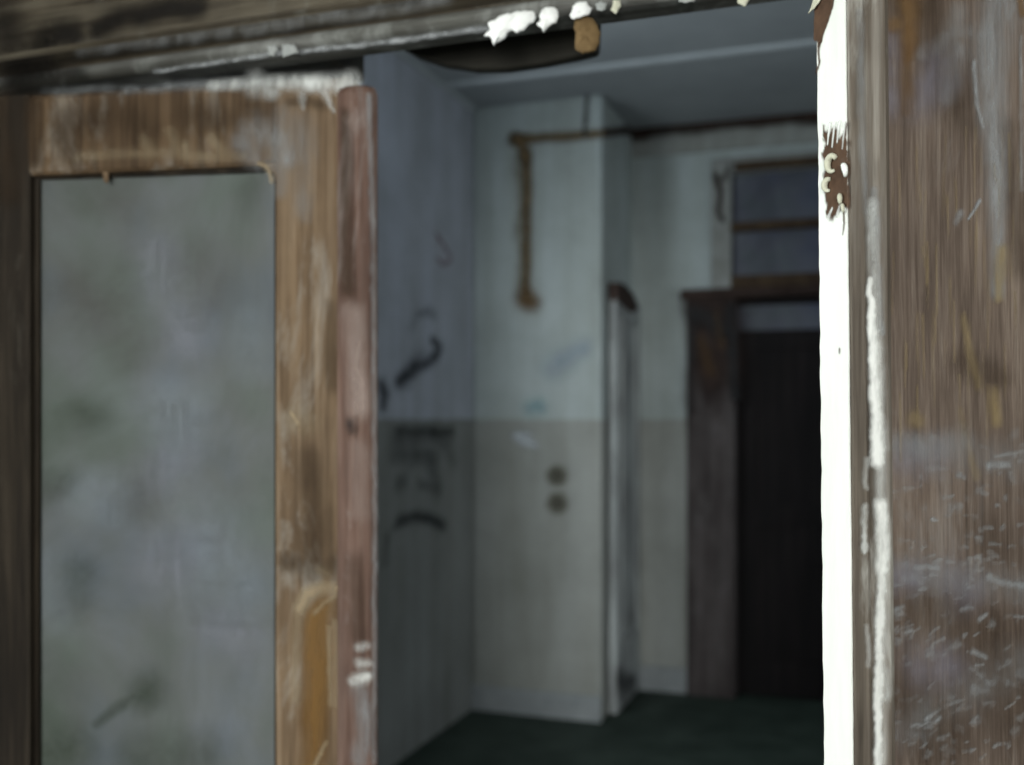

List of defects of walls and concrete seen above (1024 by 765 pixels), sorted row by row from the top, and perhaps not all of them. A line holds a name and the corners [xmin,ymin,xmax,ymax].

peeling [484,0,621,46]
spalling [821,123,851,235]